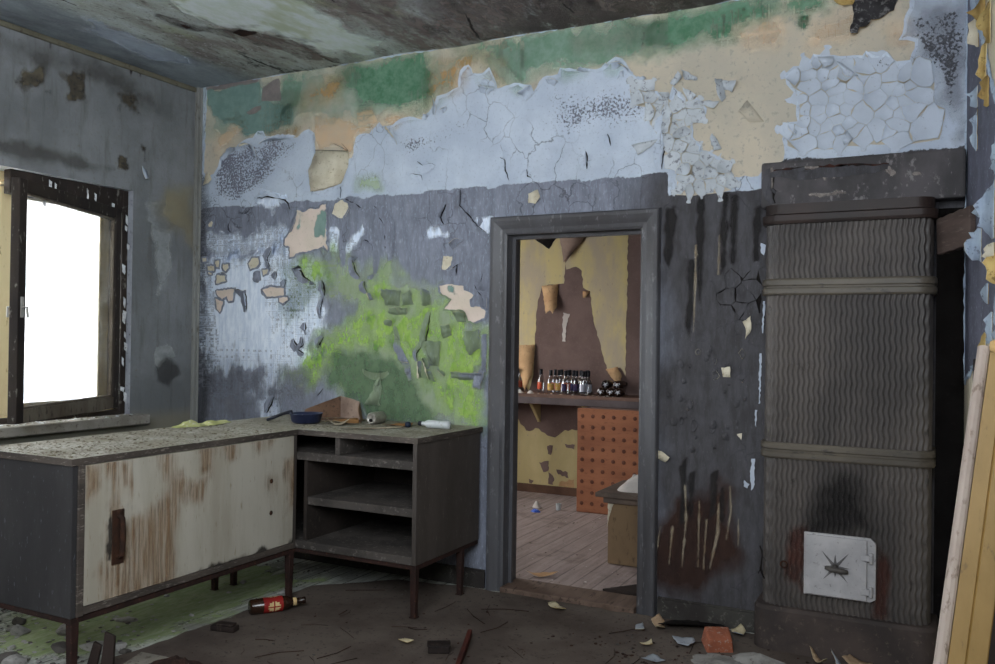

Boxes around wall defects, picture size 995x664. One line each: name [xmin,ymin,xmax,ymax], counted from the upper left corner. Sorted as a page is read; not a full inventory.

leakage [786,0,823,29]
spalling [16,66,44,88]
spalling [66,71,85,101]
peeling [202,0,945,259]
leakage [156,0,774,423]
peeling [963,0,995,385]
peeling [201,256,246,314]
peeling [247,256,290,306]
peeling [366,238,488,389]
peeling [713,359,744,382]
spalling [744,459,755,490]
corrosion [657,458,740,590]